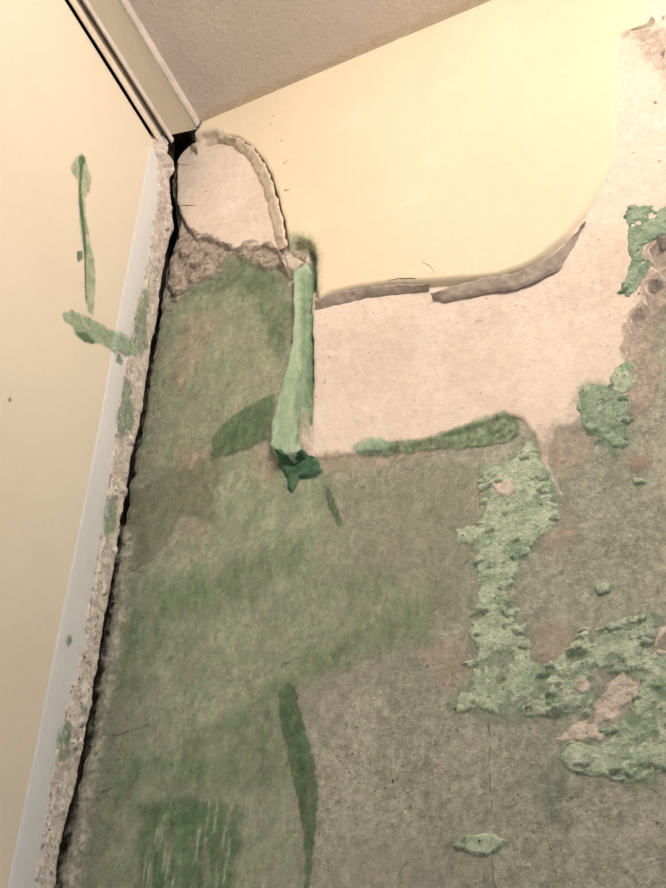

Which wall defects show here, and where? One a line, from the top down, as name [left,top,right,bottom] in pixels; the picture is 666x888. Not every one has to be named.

flaking render [167,0,666,784]
water stain [620,235,666,414]
crack [54,131,195,888]
water stain [154,814,181,888]
water stain [195,796,234,888]
peeling [453,833,507,857]